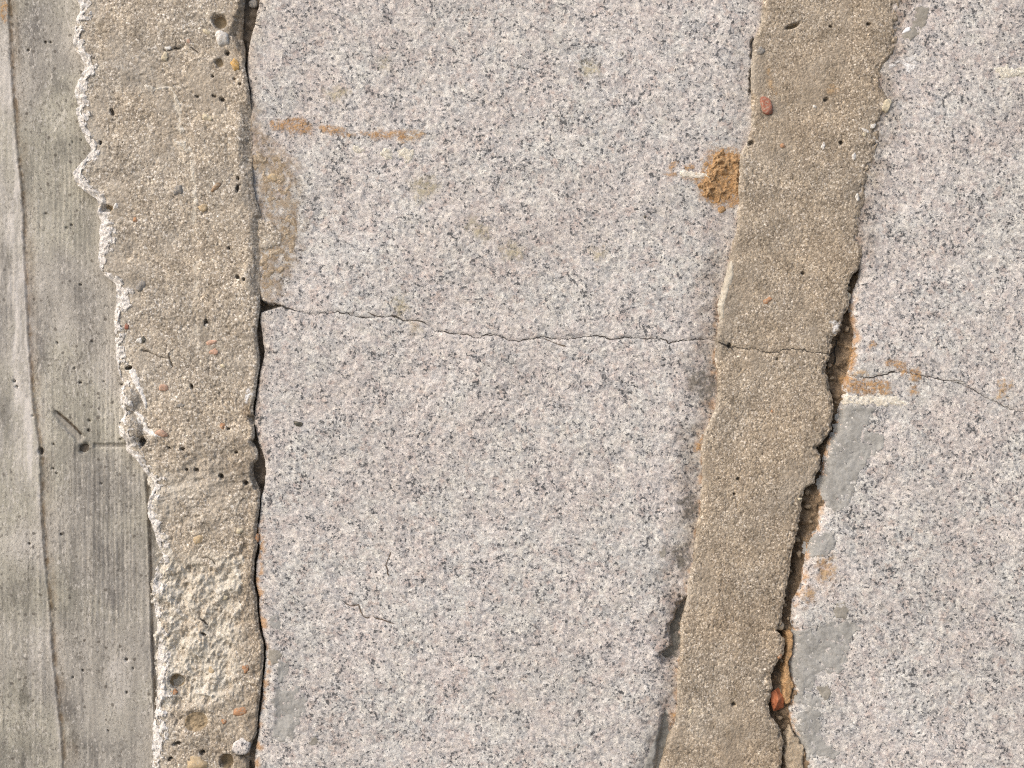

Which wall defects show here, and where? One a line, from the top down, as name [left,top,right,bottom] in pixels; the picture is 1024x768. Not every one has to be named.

spalling [73,0,245,768]
crack [265,304,1023,412]